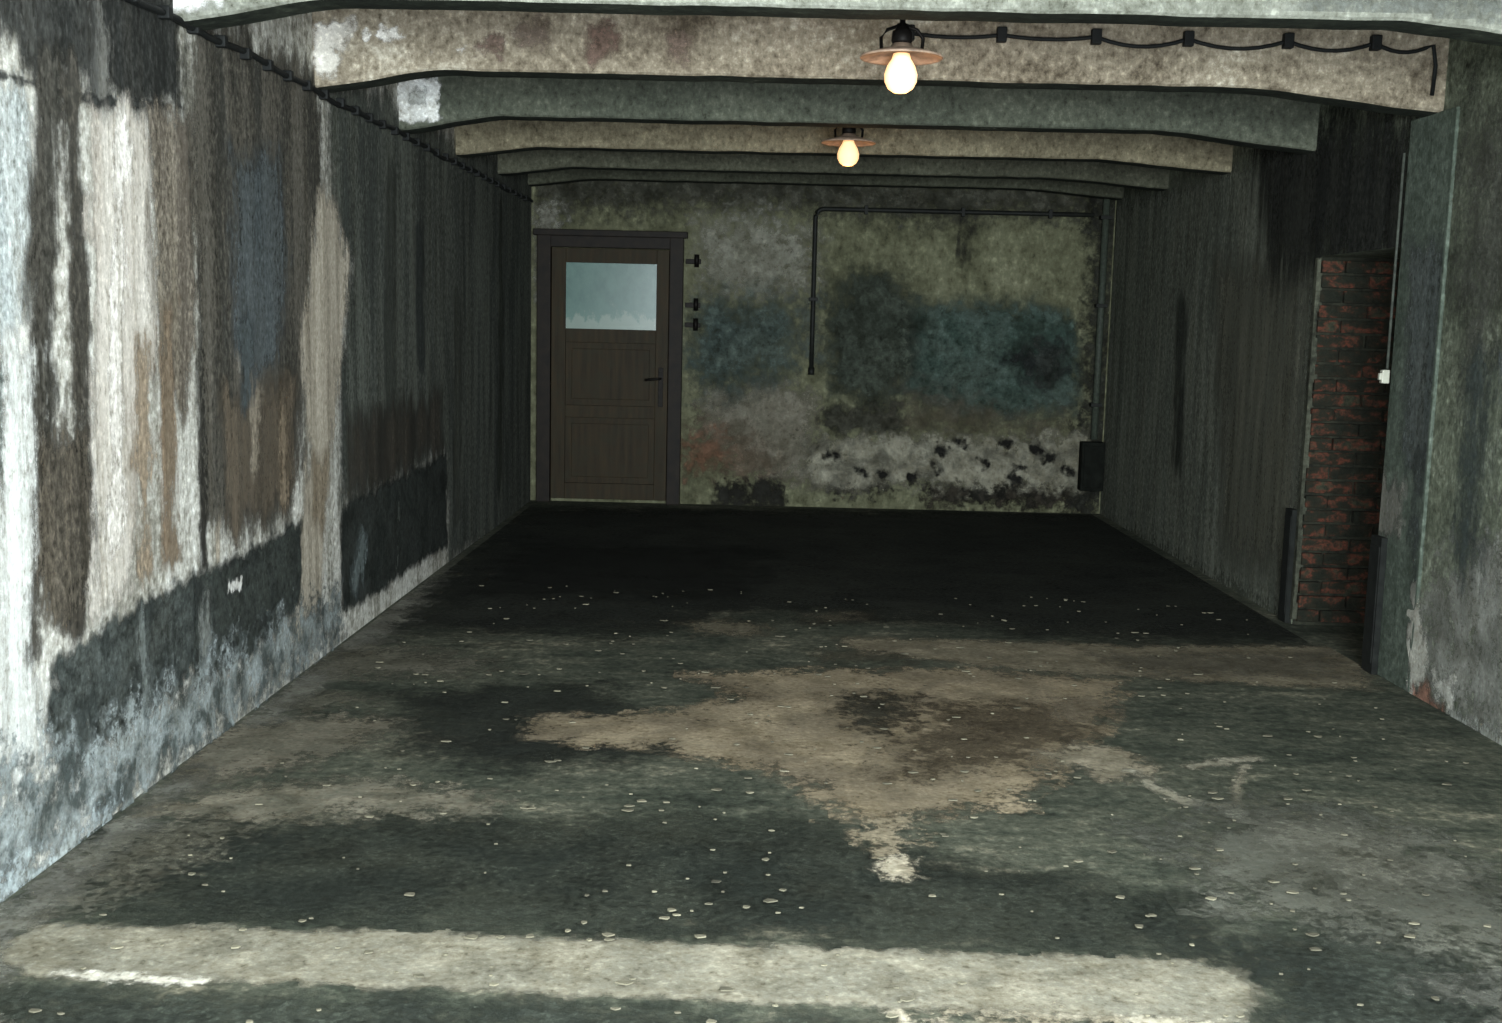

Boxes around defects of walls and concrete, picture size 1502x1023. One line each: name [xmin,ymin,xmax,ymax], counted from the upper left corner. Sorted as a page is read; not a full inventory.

peeling [532,200,570,303]
peeling [688,199,825,306]
leakage [0,0,1318,902]
flaking render [690,376,1089,501]
leakage [1402,238,1502,739]
leakage [0,813,1502,1023]